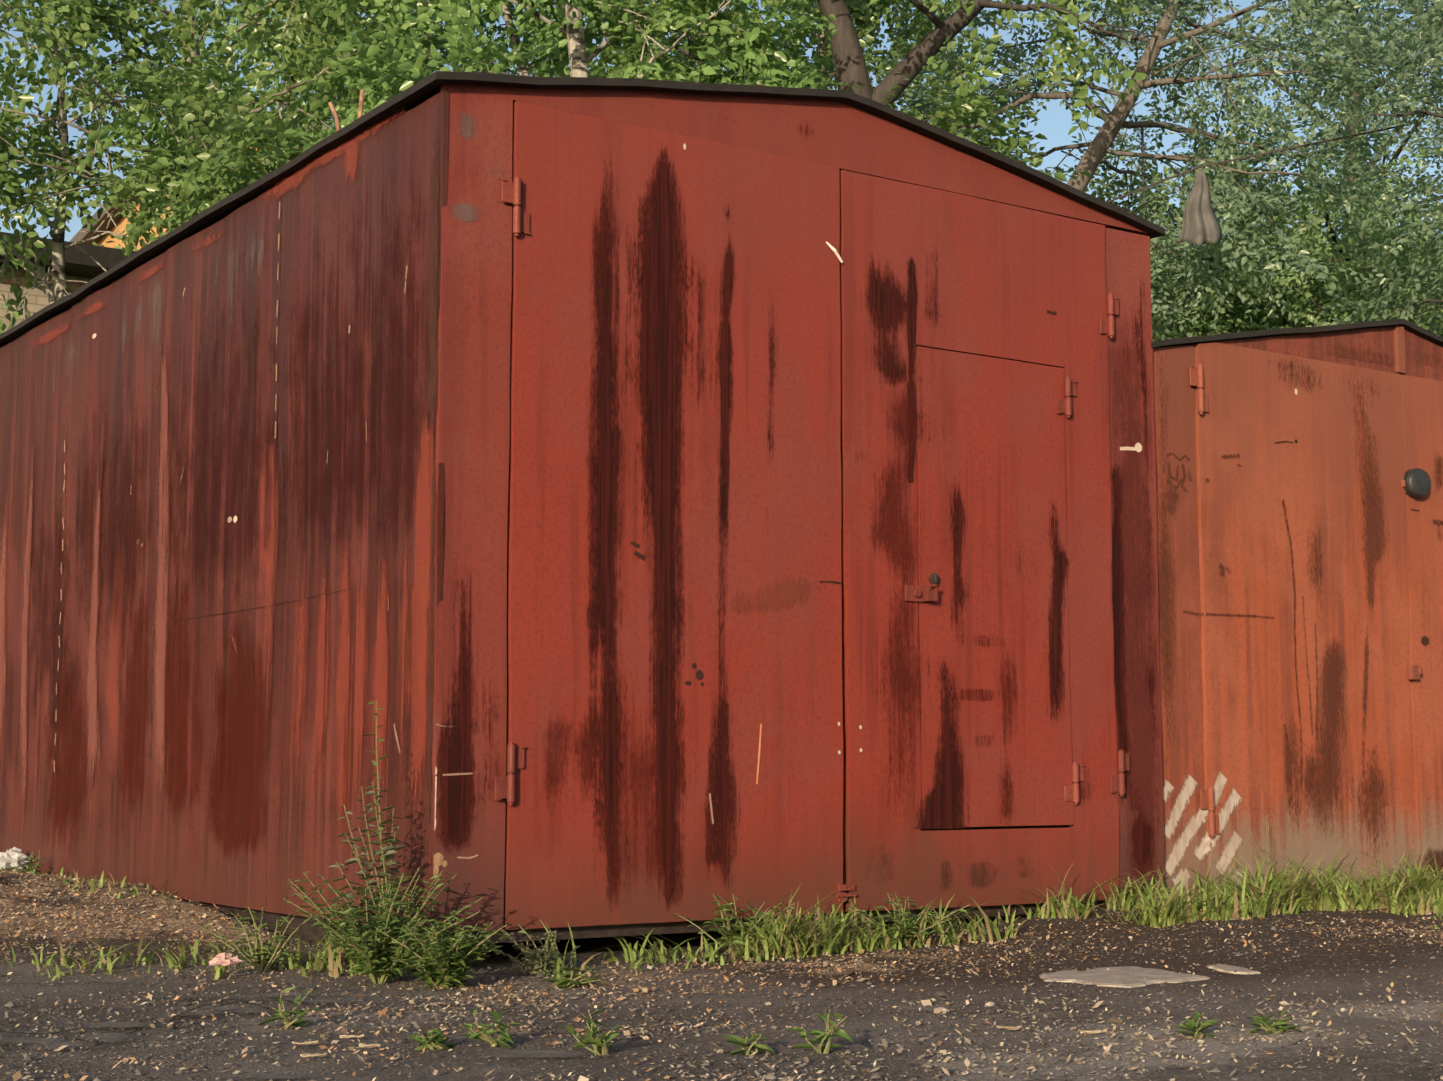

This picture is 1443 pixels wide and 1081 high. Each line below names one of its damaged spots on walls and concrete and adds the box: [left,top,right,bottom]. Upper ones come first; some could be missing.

rust [163,316,273,817]
rust [427,139,439,407]
rust [546,150,740,909]
rust [865,254,1016,829]
rust [1044,505,1069,718]
rust [1111,286,1192,879]
rust [1304,643,1387,845]
rust [1356,385,1386,606]